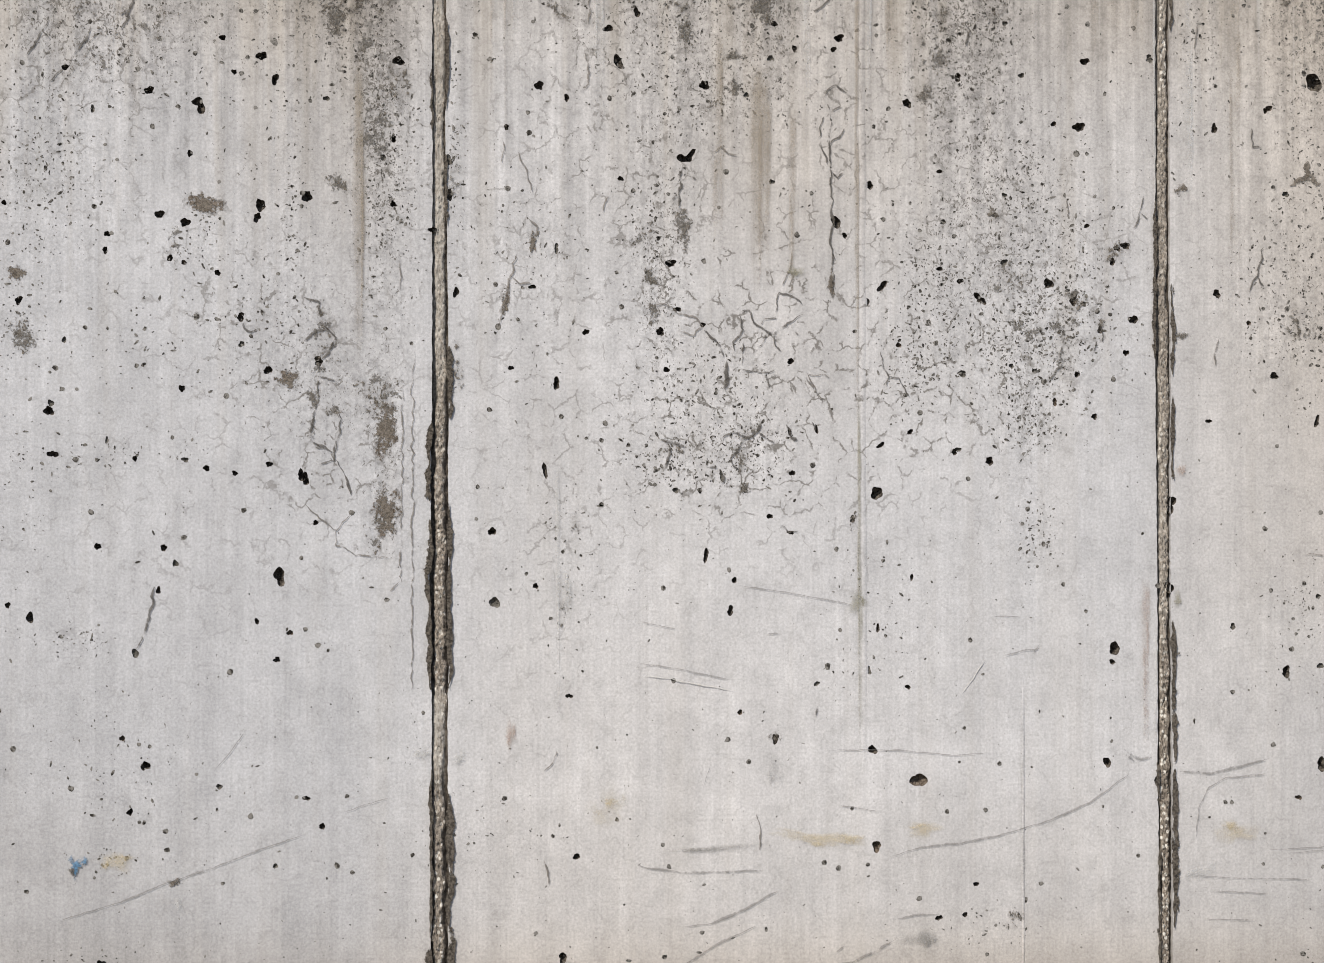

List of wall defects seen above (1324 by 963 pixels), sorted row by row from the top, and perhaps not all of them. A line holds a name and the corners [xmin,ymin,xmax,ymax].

crack [656,79,846,388]
crack [661,373,829,483]
crack [880,352,908,395]
crack [1043,323,1104,382]
crack [306,298,415,686]